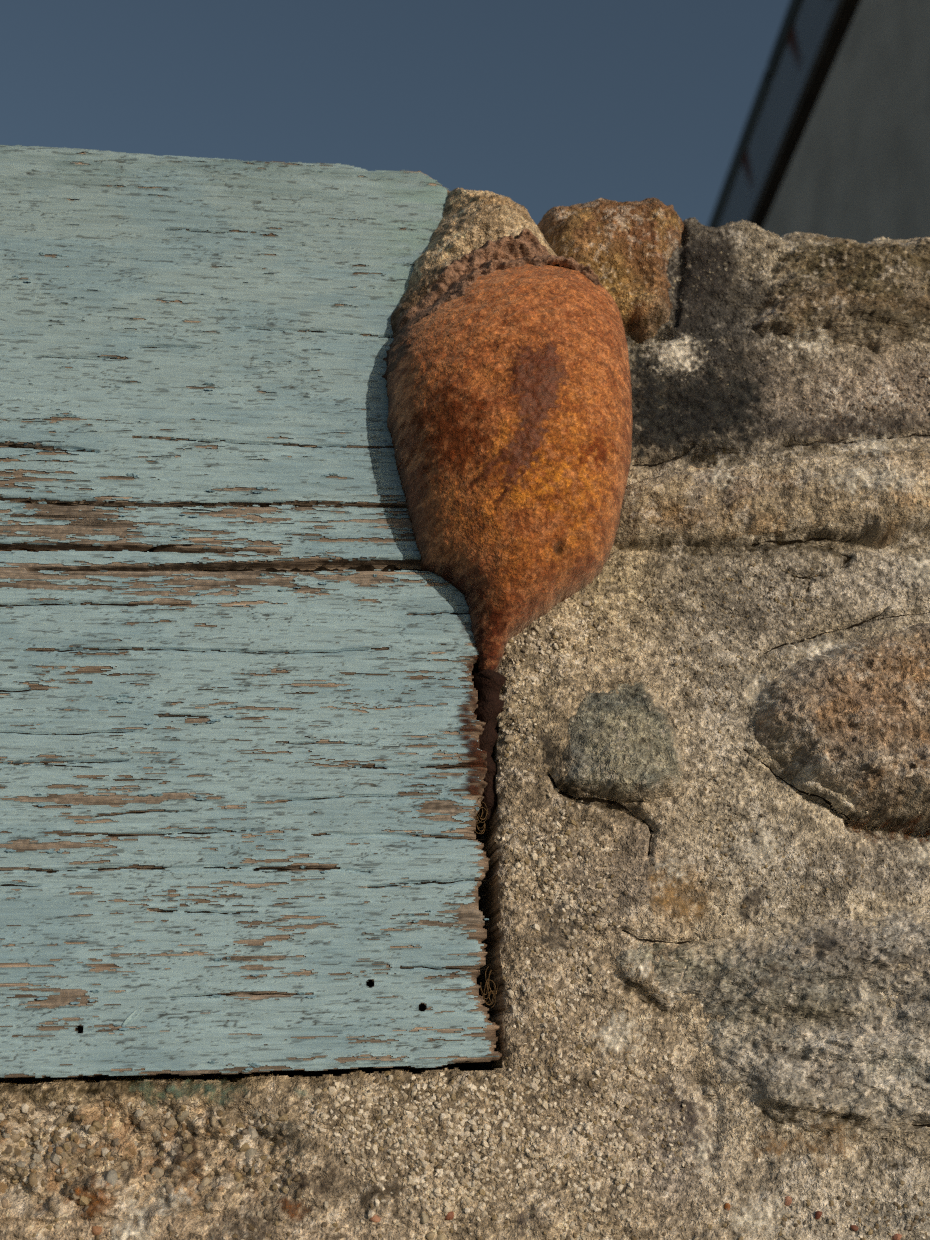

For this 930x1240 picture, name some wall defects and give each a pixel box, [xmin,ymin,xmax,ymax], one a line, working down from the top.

corrosion [402,341,567,502]
water stain [629,339,769,456]
peeling [0,486,412,604]
crack [764,607,930,654]
peeling [107,694,280,729]
peeling [0,792,210,808]
peeling [414,795,480,822]
crack [548,774,654,855]
crack [743,749,849,820]
peeling [0,839,109,854]
peeling [392,906,489,929]
peeling [205,953,316,1001]